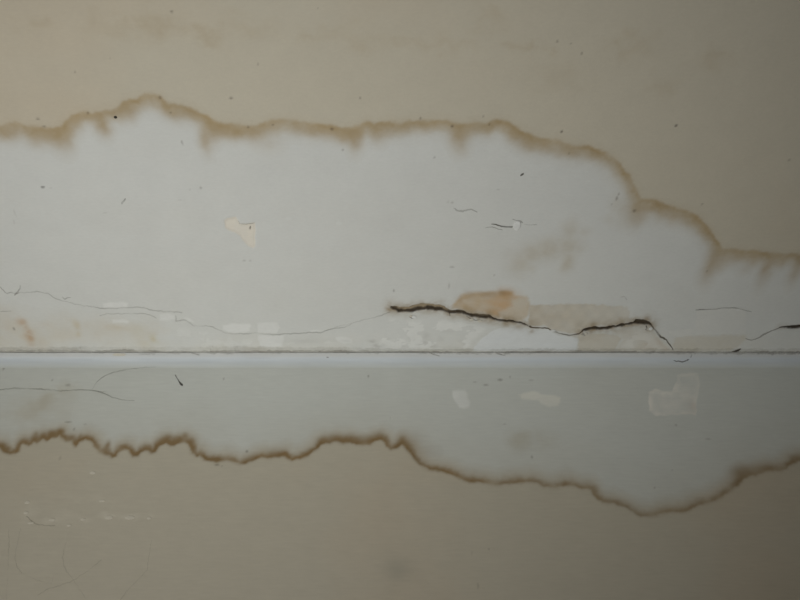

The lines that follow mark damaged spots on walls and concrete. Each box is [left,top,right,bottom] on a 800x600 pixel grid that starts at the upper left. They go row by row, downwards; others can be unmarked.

water stain [0,90,800,353]
crack [221,321,285,338]
crack [379,296,692,362]
peeling [527,302,633,334]
crack [773,322,800,332]
water stain [0,368,800,520]